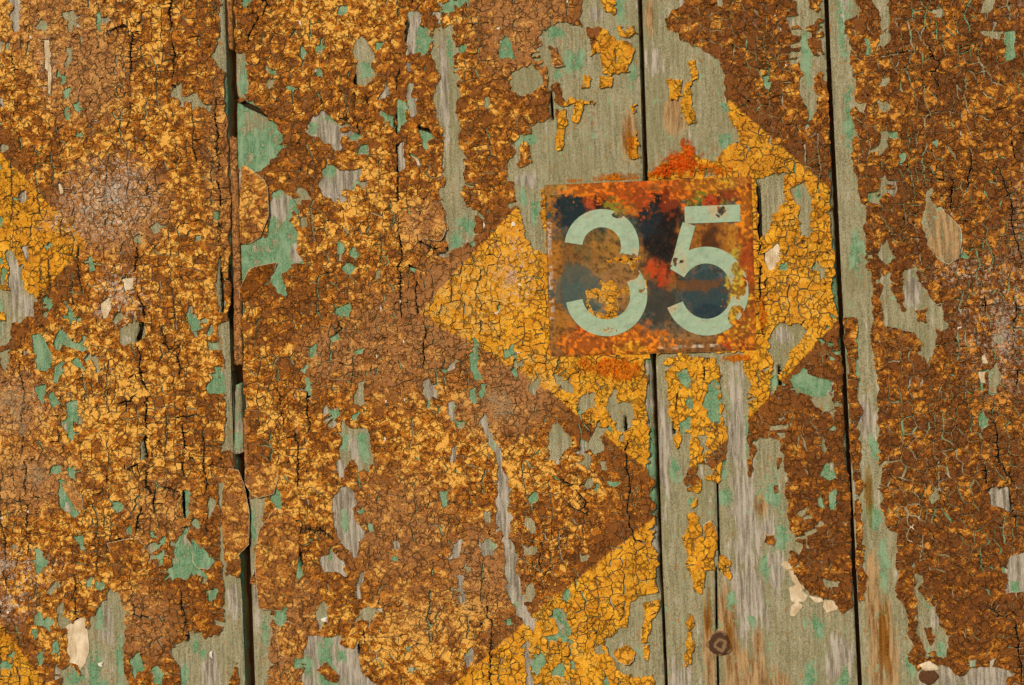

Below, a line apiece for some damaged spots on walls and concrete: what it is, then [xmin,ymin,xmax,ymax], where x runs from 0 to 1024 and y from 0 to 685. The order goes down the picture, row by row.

crack [112,23,140,125]
peeling [210,0,303,303]
peeling [378,0,478,255]
peeling [499,0,738,254]
corrosion [653,139,729,177]
peeling [31,576,164,685]
crack [108,248,208,542]
peeling [149,462,376,685]
crack [279,393,311,482]
crack [625,418,641,541]
peeling [593,0,1017,685]
crack [984,419,1017,520]